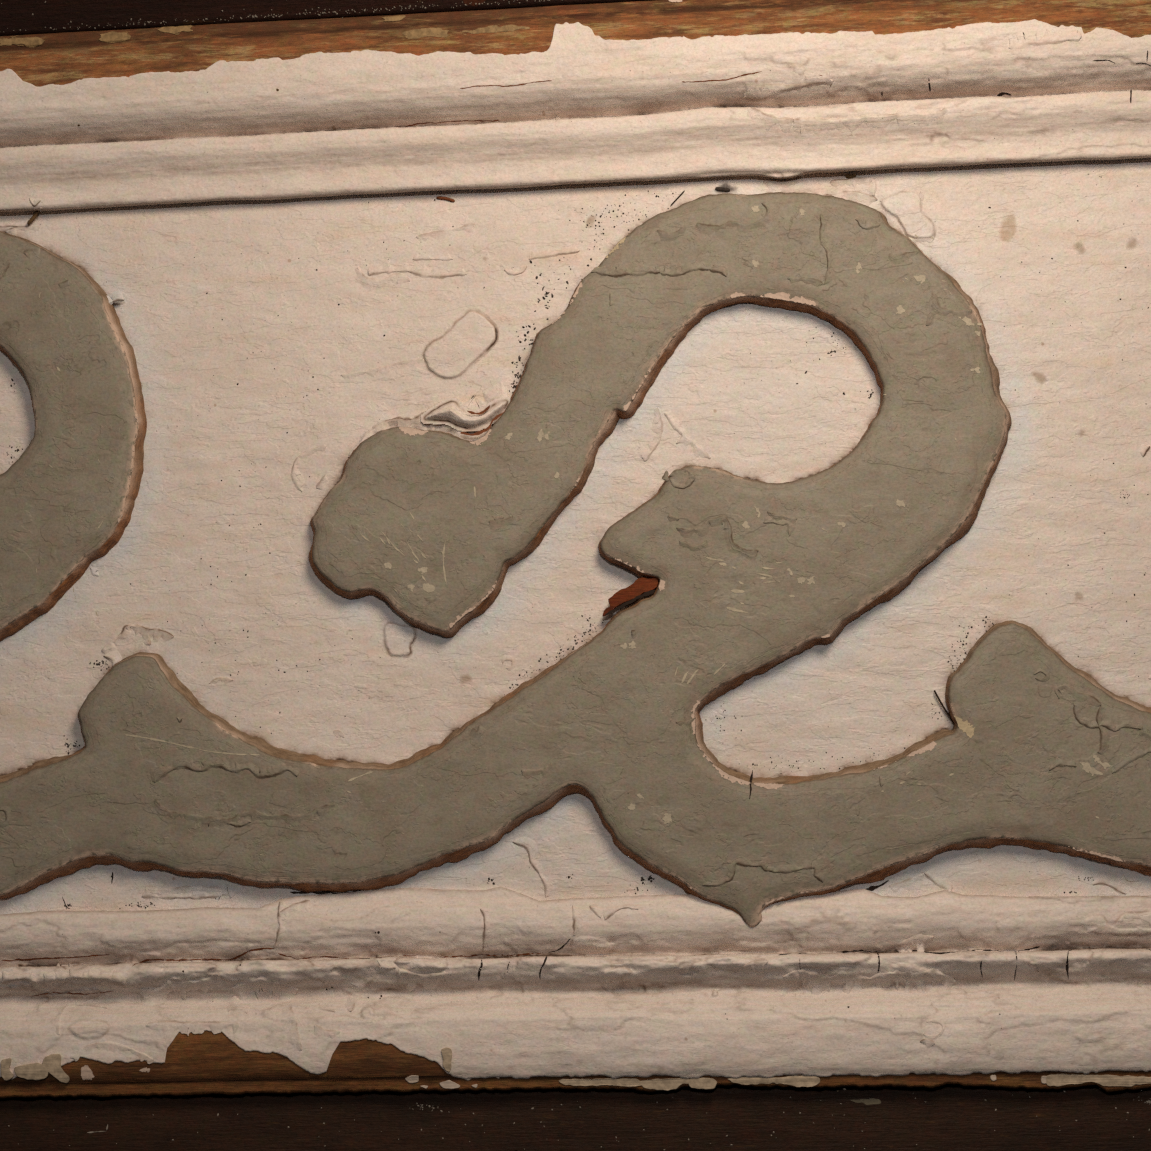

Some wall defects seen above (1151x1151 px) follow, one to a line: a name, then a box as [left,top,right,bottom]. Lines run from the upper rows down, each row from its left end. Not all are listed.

peeling [590,0,1151,40]
peeling [0,15,553,87]
crack [291,888,361,896]
crack [702,855,825,887]
crack [866,880,889,891]
crack [2,939,570,979]
crack [841,946,1094,980]
crack [32,990,111,998]
peeling [1,1030,309,1084]
peeling [328,1038,478,1089]
peeling [559,1078,643,1087]
peeling [728,1075,820,1087]